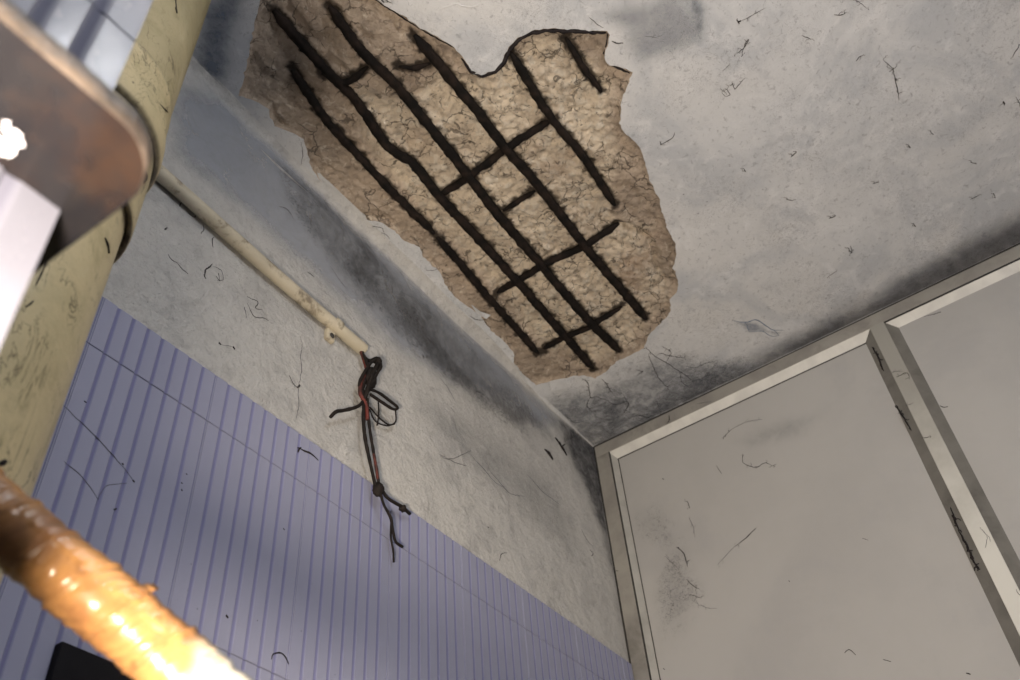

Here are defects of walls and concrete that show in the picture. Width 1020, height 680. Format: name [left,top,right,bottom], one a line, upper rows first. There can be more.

spalling [238,0,678,396]
water stain [555,354,750,531]